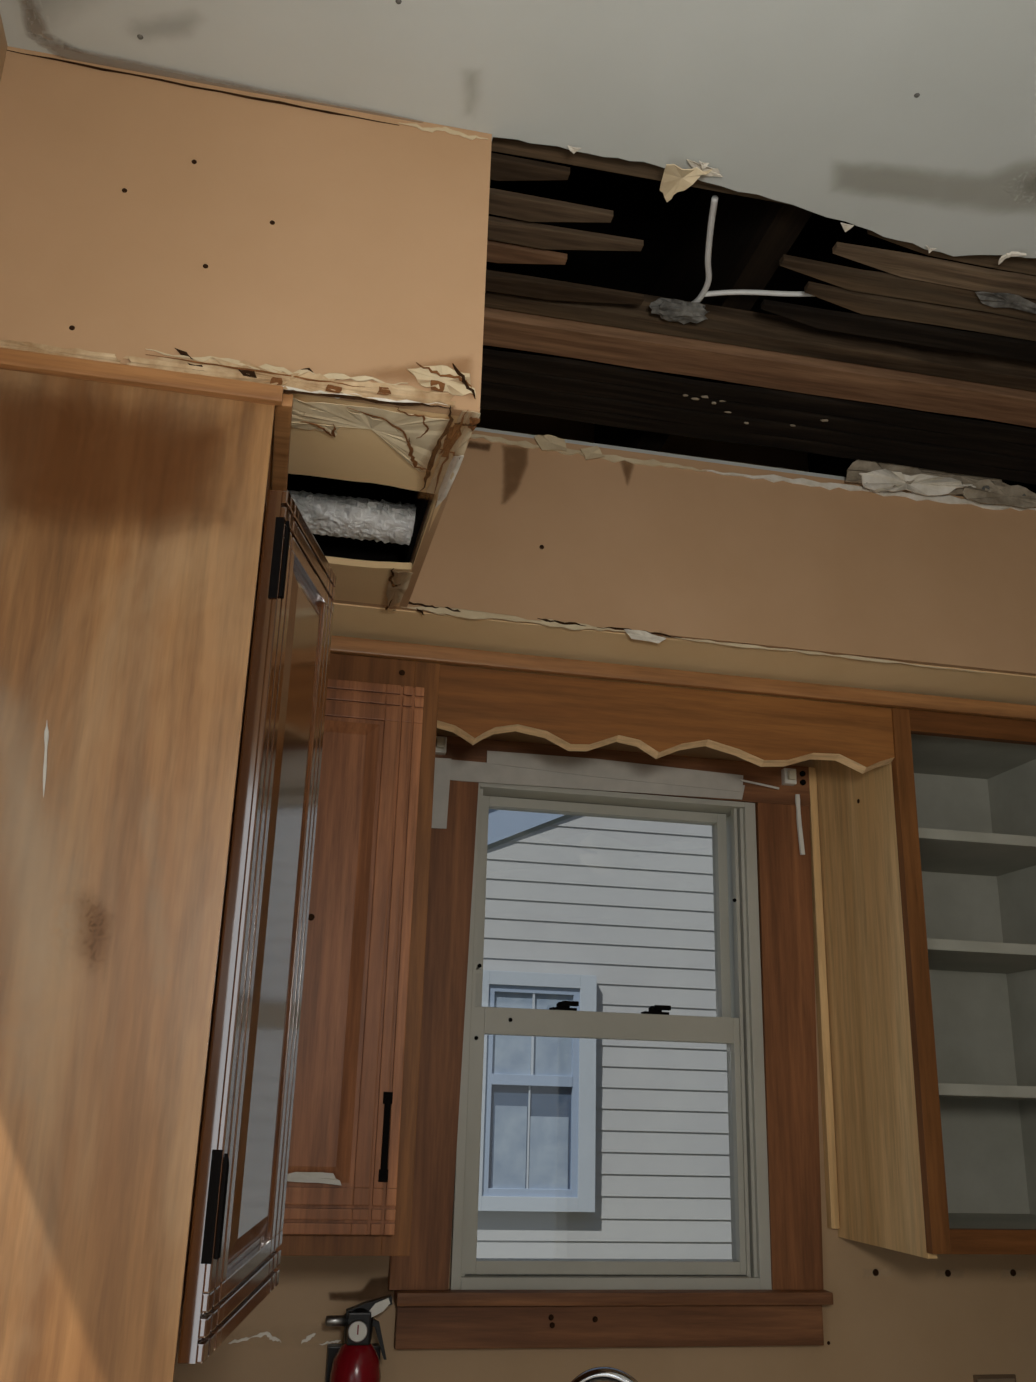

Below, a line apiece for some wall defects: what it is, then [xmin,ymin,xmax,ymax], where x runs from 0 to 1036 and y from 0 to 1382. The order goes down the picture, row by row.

peeling [660,159,723,202]
crack [146,354,477,493]
peeling [0,340,1036,511]